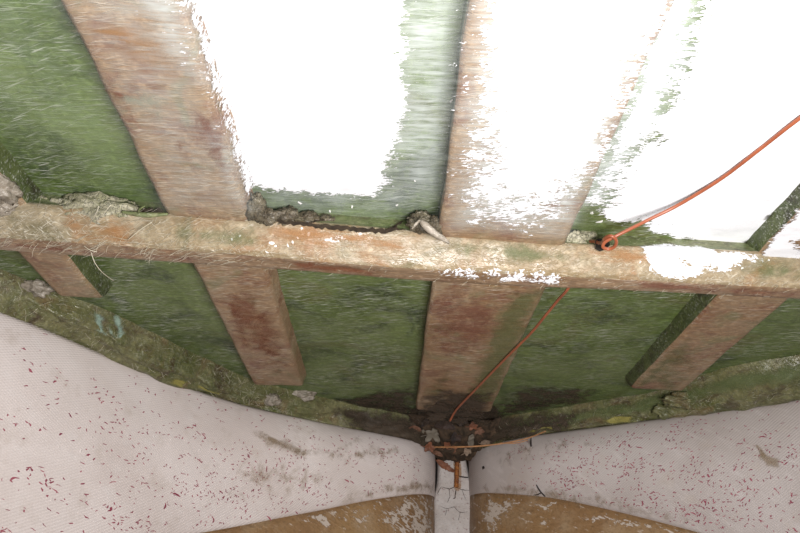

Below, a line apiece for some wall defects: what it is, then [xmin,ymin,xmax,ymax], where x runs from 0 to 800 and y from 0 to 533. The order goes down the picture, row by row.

peeling [304,490,435,533]
peeling [475,494,556,532]
peeling [586,514,678,533]